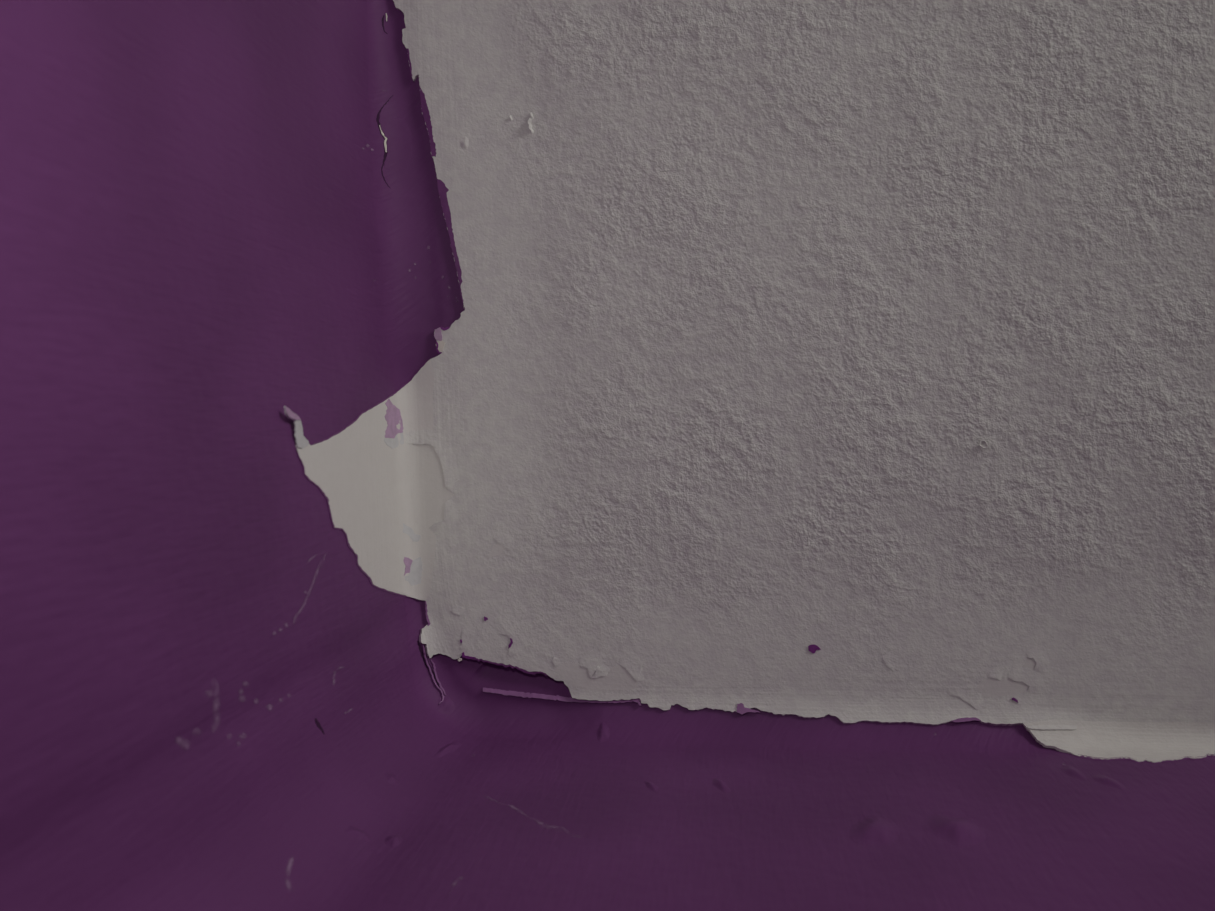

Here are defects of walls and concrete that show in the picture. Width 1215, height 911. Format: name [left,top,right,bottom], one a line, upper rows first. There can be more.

peeling [407,48,436,157]
peeling [437,179,465,309]
peeling [284,327,465,601]
peeling [976,645,1050,697]
peeling [1022,720,1215,764]